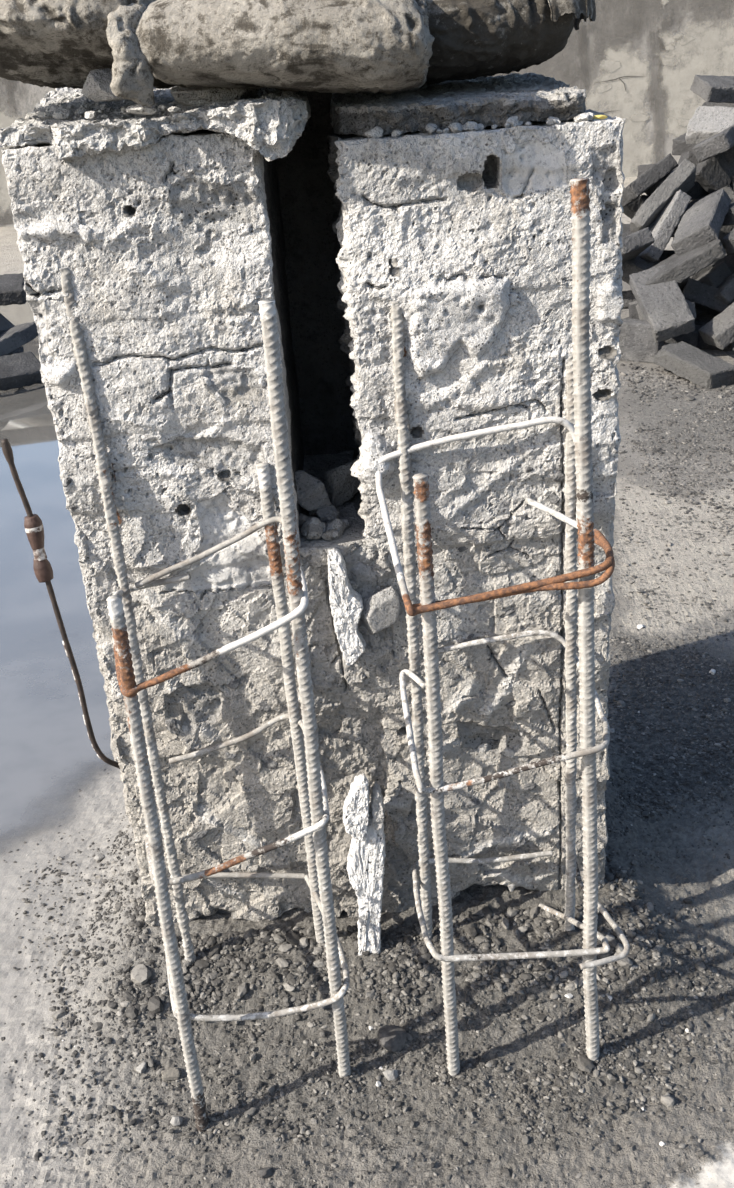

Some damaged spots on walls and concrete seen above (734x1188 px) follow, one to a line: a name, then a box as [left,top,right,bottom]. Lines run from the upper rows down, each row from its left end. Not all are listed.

crack [94,346,259,400]
crack [456,367,564,595]